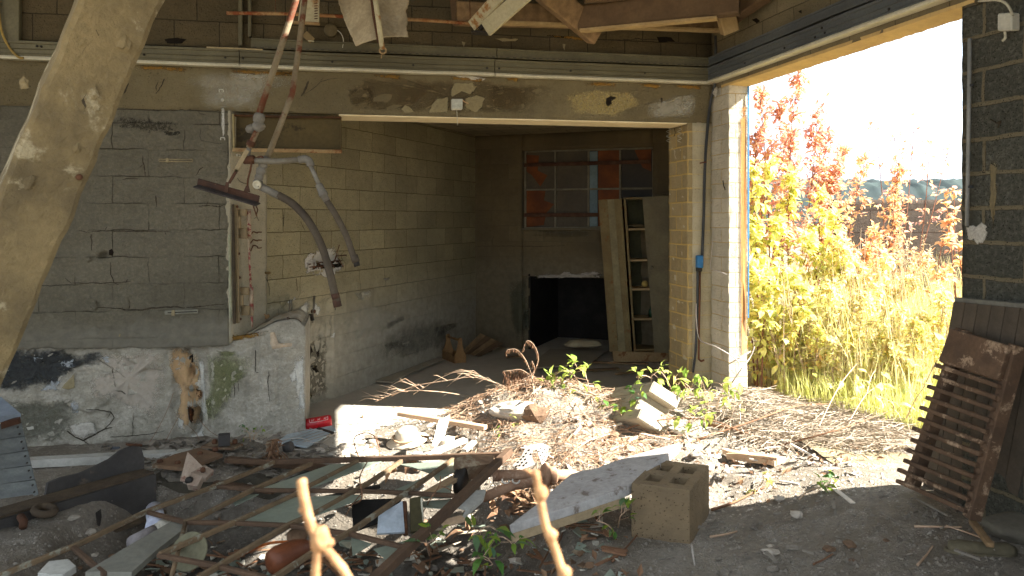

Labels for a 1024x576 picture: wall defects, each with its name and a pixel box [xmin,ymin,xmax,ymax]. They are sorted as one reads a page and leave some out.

peeling [428,75,485,113]
spalling [586,82,616,106]
crack [65,196,224,311]
crack [67,369,162,444]